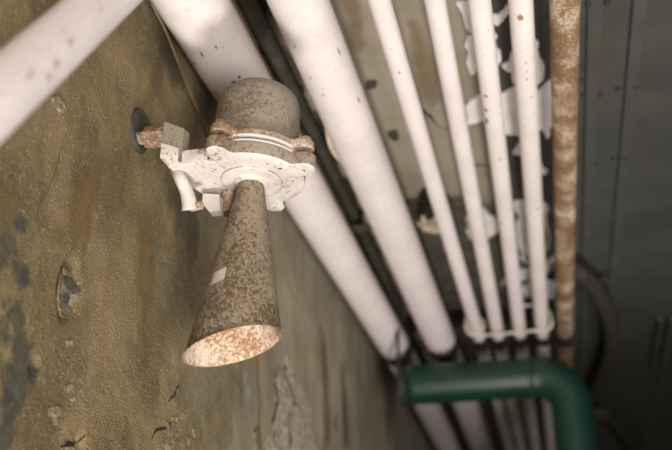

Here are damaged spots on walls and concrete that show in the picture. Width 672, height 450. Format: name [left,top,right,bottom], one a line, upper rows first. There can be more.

peeling [456,1,477,76]
peeling [465,94,488,125]
peeling [493,3,521,156]
peeling [531,38,552,139]
leakage [0,233,30,289]
spalling [55,266,81,319]
leakage [0,300,37,450]
peeling [253,356,318,450]